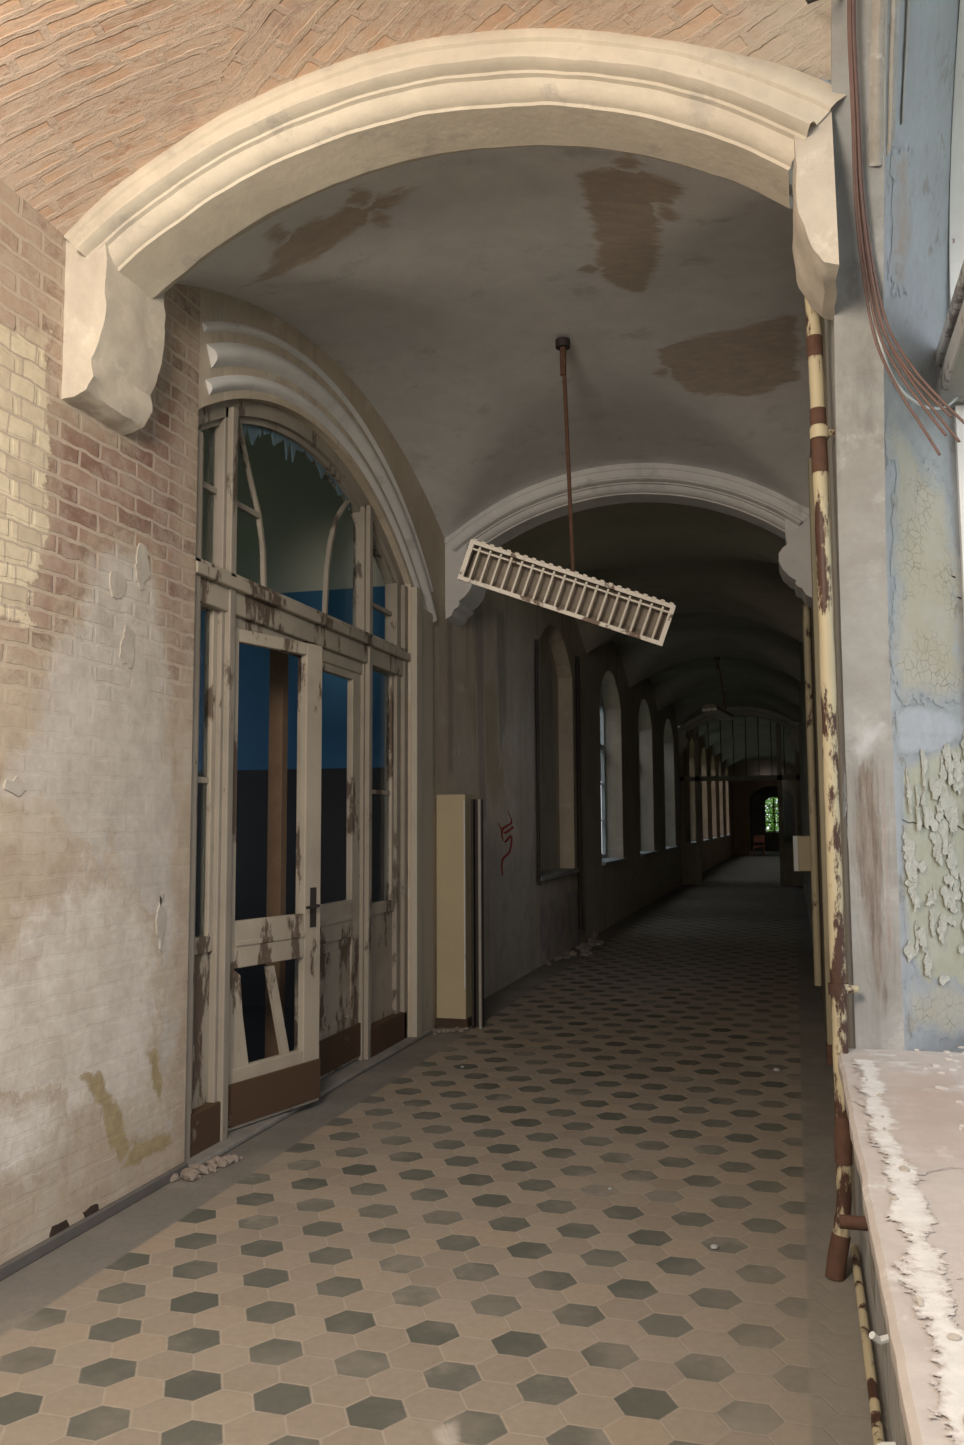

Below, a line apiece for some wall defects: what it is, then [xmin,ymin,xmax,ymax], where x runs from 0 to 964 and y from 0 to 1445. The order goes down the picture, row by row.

spalling [572,152,690,295]
spalling [649,311,805,398]
peeling [0,319,187,1177]
damp [0,828,176,1201]
peeling [851,733,964,1445]